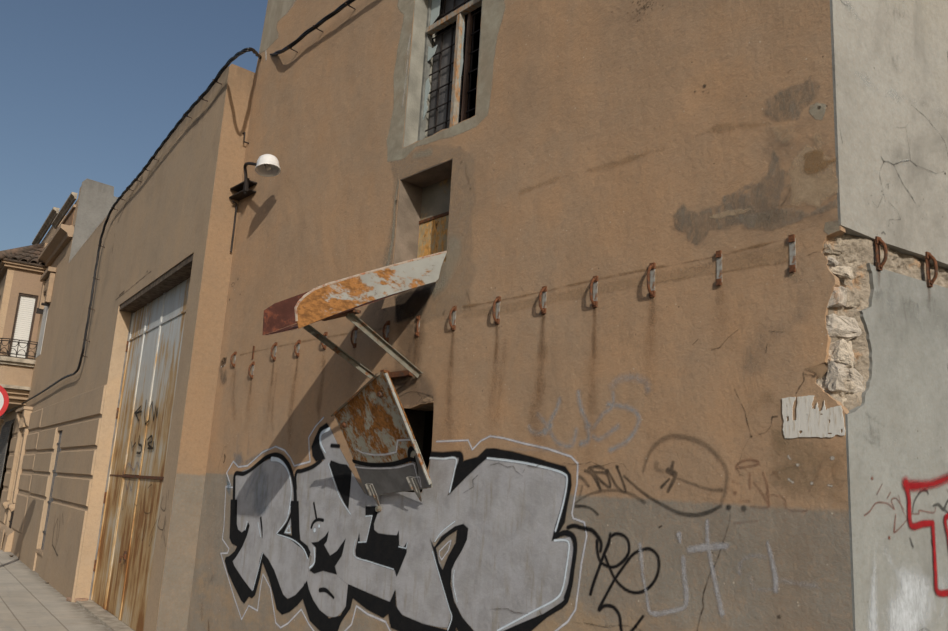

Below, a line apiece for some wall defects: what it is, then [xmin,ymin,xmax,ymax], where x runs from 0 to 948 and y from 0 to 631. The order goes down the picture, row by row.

water stain [676,136,838,243]
spalling [816,233,948,411]